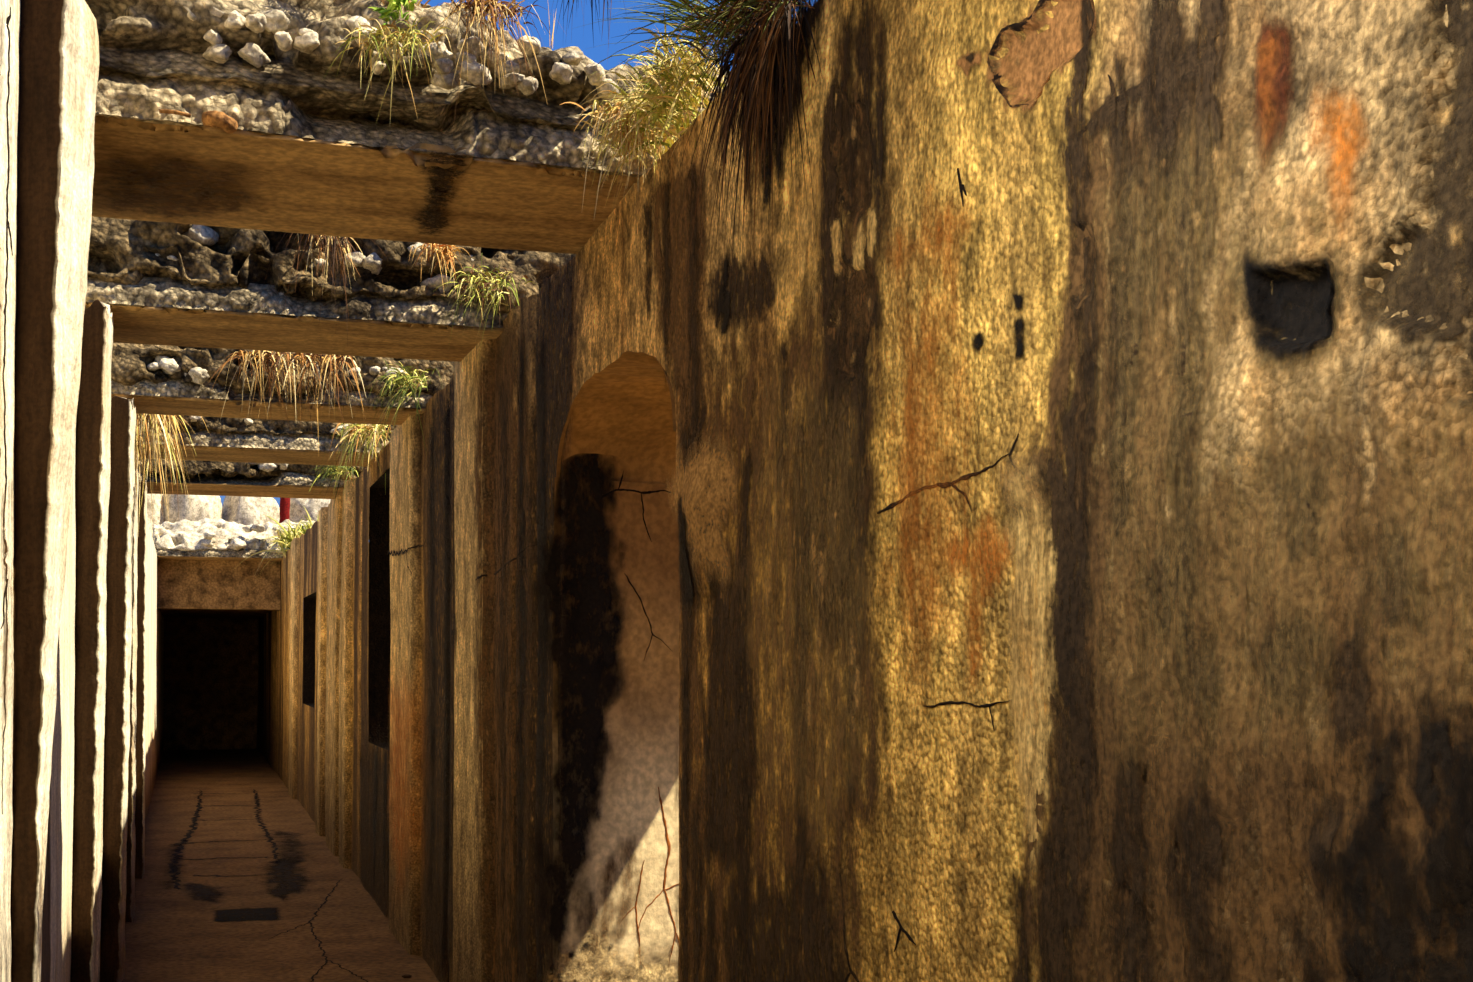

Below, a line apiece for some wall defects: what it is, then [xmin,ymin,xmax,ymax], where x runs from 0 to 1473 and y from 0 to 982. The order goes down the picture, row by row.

spalling [956,0,1096,110]
rust [1256,23,1291,173]
spalling [1235,0,1473,414]
leakage [642,0,891,982]
crack [877,433,1027,514]
leakage [1007,0,1473,982]
crack [168,790,368,982]
leakage [266,831,309,897]
leakage [578,843,634,947]